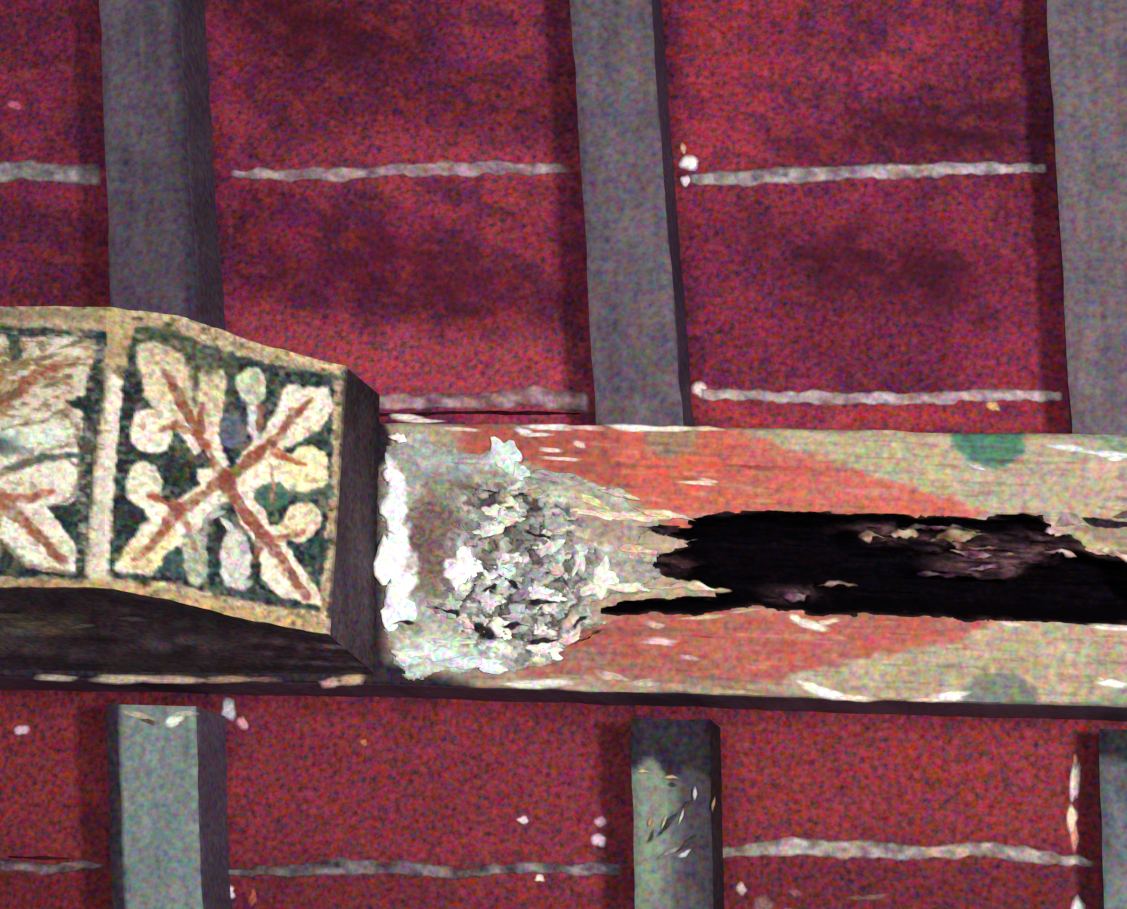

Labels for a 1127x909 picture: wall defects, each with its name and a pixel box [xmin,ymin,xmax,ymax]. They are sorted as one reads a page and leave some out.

peeling [373,414,675,689]
peeling [681,608,759,620]
peeling [790,615,839,631]